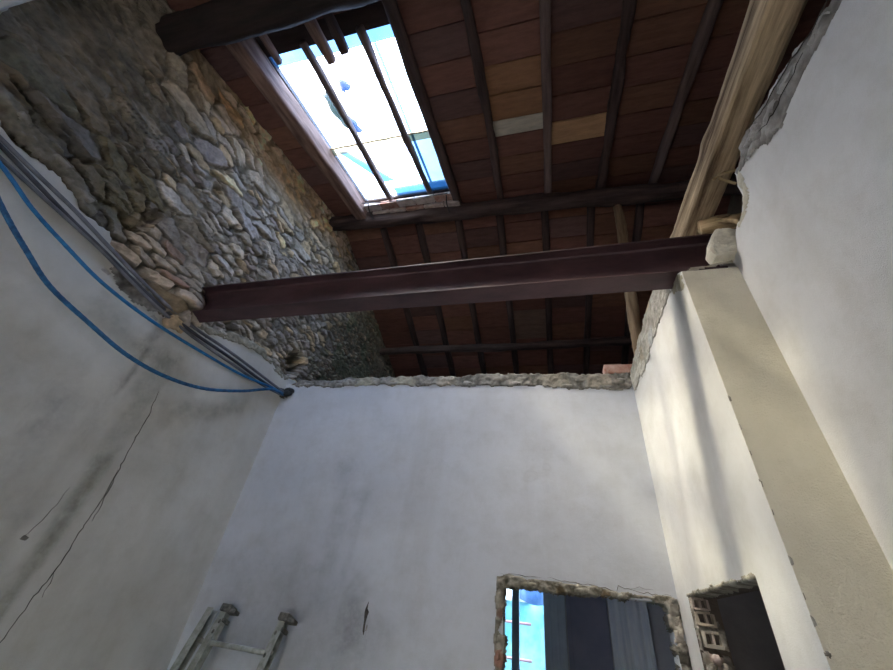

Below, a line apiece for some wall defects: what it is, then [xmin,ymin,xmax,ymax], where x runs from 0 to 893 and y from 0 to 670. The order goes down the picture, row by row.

spalling [735,0,842,228]
crack [0,391,159,643]